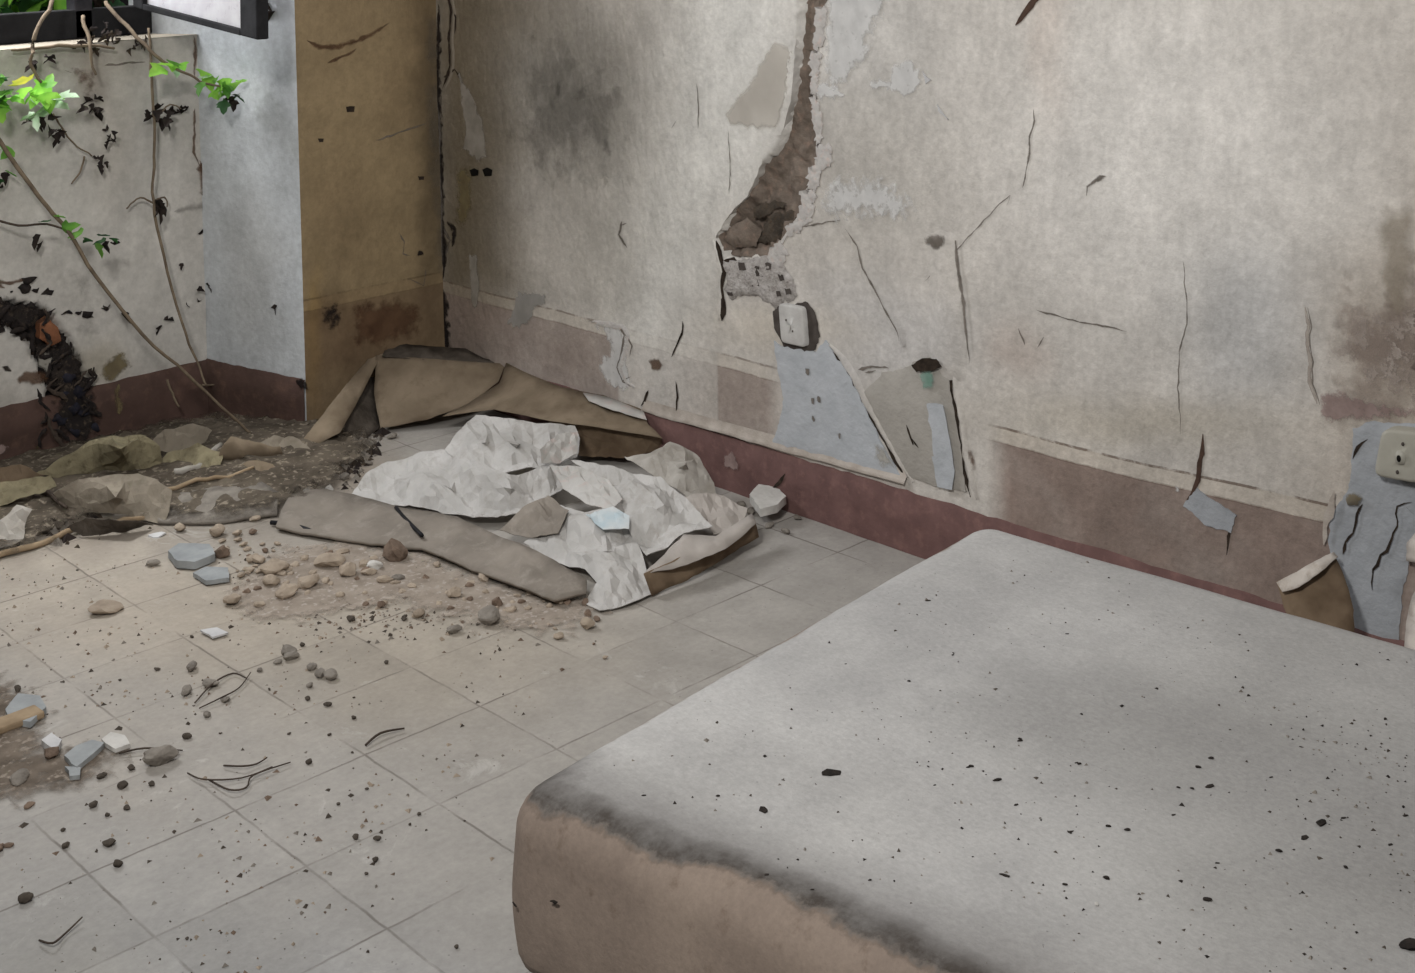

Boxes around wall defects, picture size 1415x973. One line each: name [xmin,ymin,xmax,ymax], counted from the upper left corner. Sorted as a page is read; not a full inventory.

crack [1015,0,1038,25]
flaking render [711,0,967,492]
flaking render [0,276,109,448]
flaking render [1176,488,1237,533]
flaking render [1321,392,1415,640]